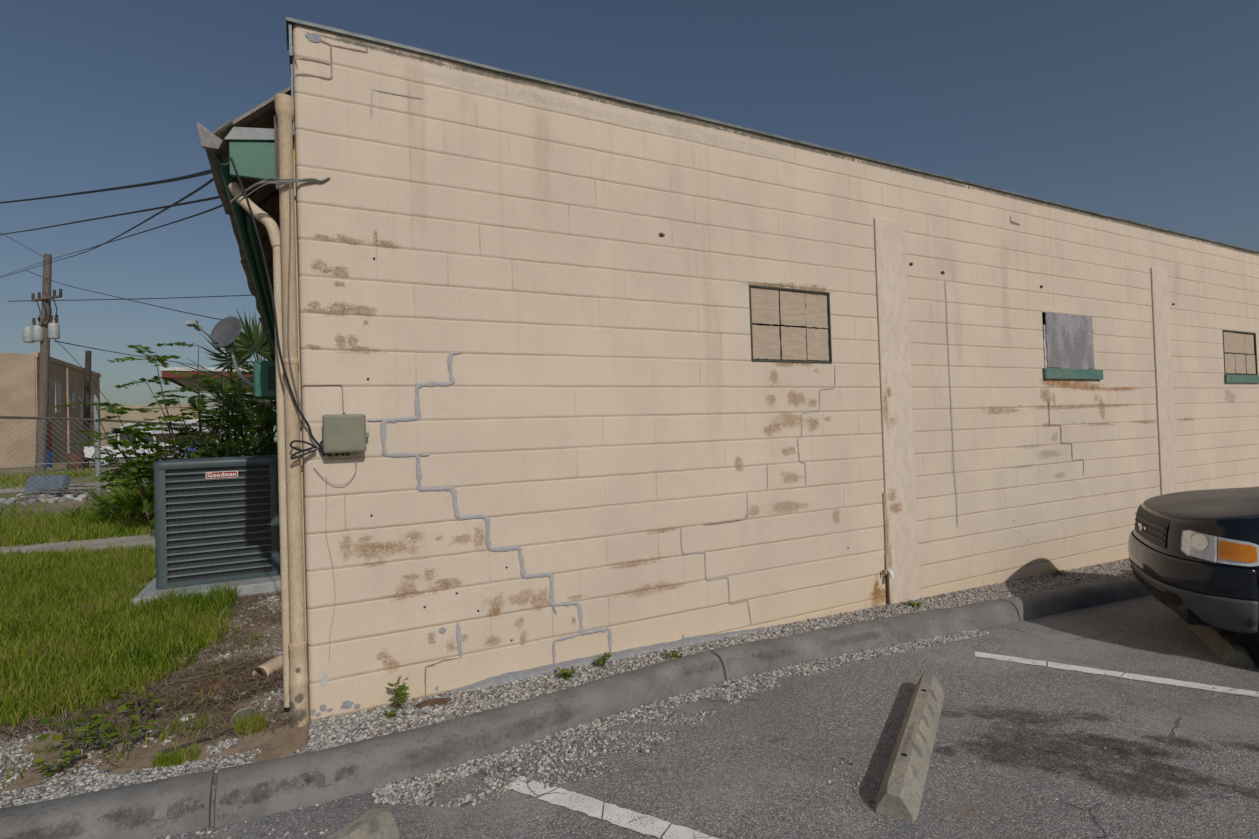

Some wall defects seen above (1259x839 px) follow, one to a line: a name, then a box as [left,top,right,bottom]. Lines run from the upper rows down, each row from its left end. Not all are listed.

crack [425,623,463,696]
crack [368,352,612,664]